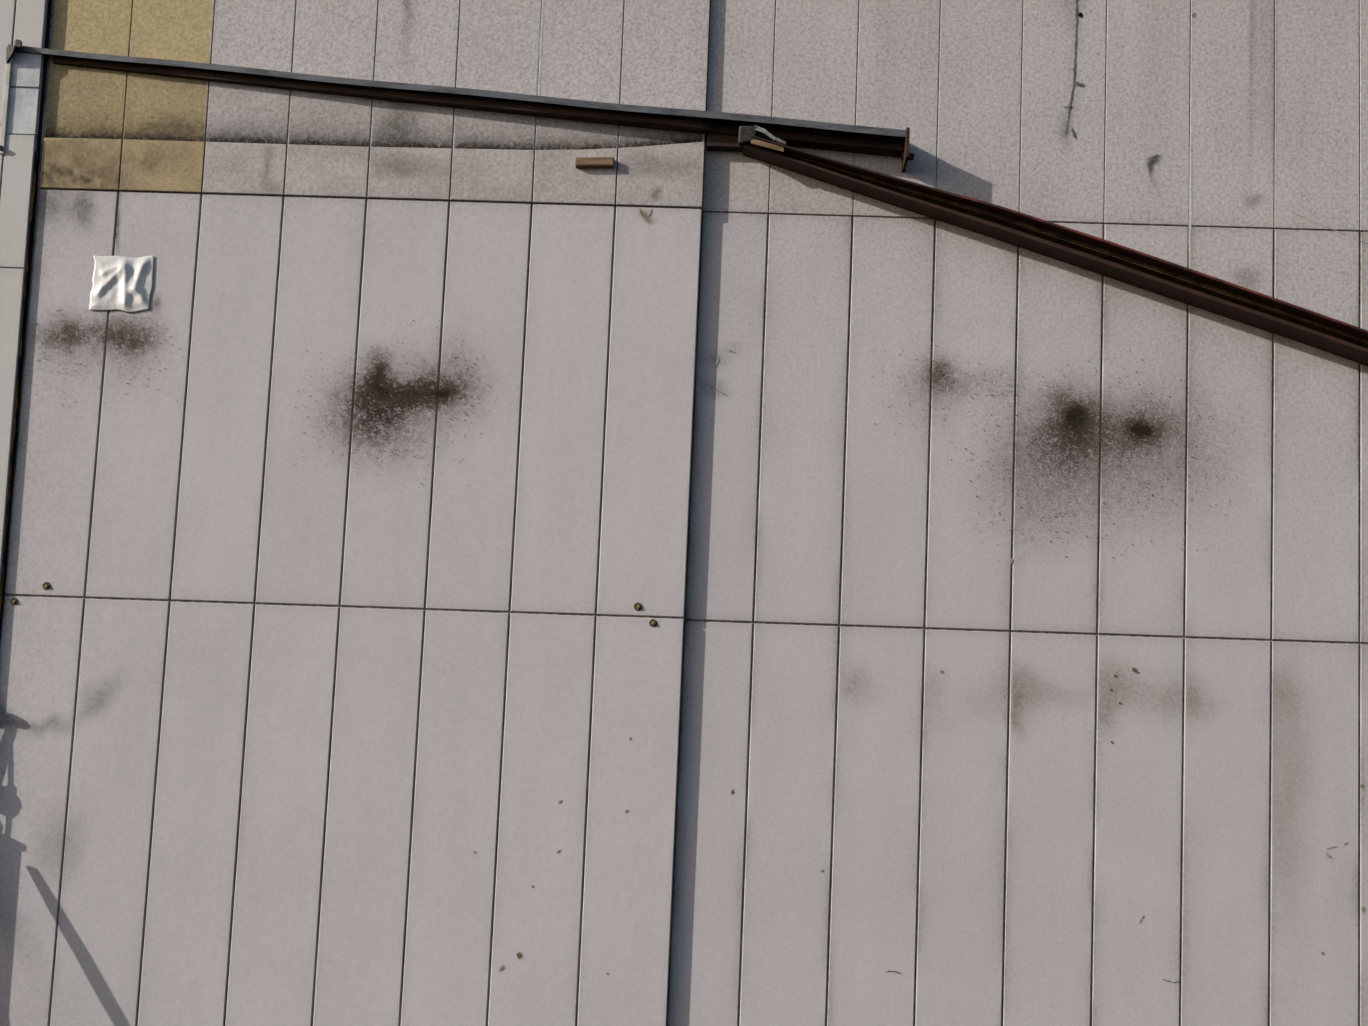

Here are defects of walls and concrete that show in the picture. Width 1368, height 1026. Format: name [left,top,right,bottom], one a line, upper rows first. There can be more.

crack [1064,0,1084,138]